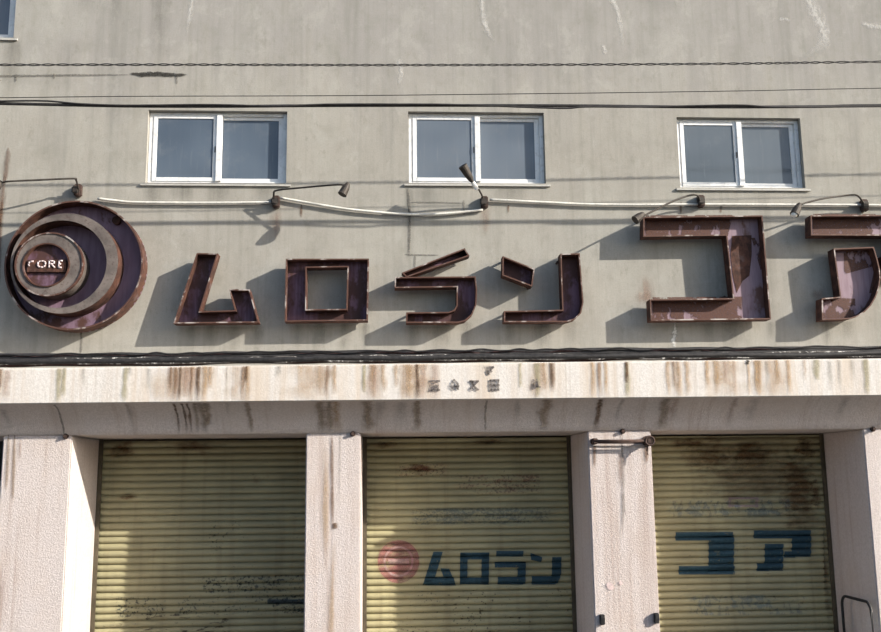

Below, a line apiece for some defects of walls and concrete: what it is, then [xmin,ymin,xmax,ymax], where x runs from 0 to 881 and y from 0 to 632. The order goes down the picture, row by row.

corrosion [0,150,8,248]
corrosion [170,367,211,425]
corrosion [395,364,419,422]
corrosion [591,362,607,385]
corrosion [324,440,337,528]